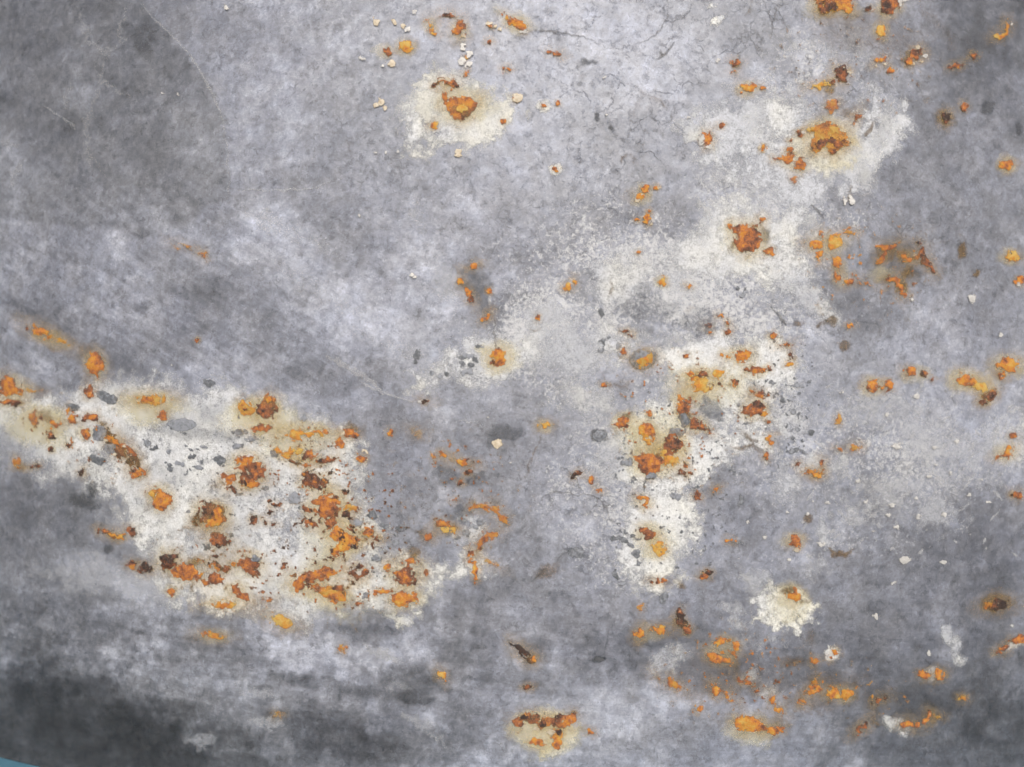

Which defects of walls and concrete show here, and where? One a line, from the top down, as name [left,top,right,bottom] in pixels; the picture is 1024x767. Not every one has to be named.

corrosion [431,70,478,130]
corrosion [758,64,862,184]
corrosion [727,217,775,256]
corrosion [28,407,147,479]
corrosion [238,392,279,433]
corrosion [613,410,693,478]
corrosion [675,350,774,460]
damp [72,486,96,509]
corrosion [274,426,380,604]
corrosion [125,500,260,609]
corrosion [373,558,429,608]
corrosion [512,711,577,750]